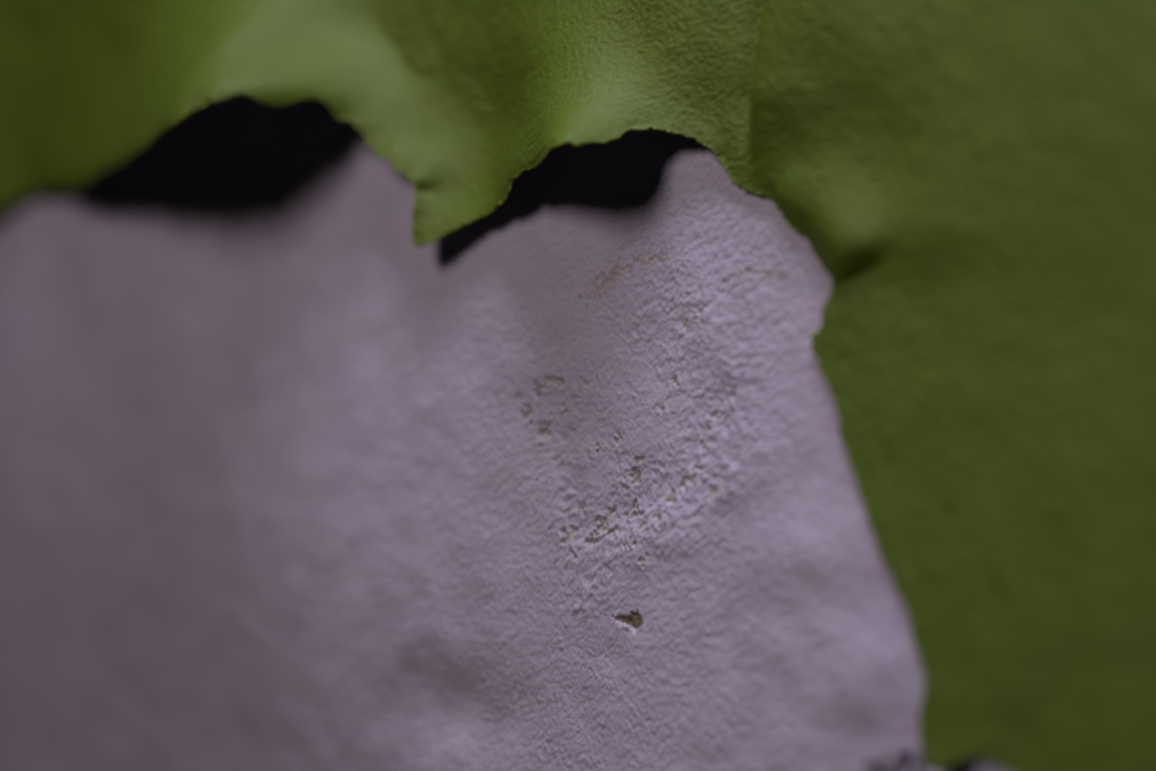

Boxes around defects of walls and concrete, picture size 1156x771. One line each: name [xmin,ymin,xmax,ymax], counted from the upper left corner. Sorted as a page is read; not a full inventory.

peeling [0,0,746,247]
flaking render [552,378,747,583]
flaking render [671,280,716,340]
peeling [737,0,1156,771]
spalling [605,603,647,638]